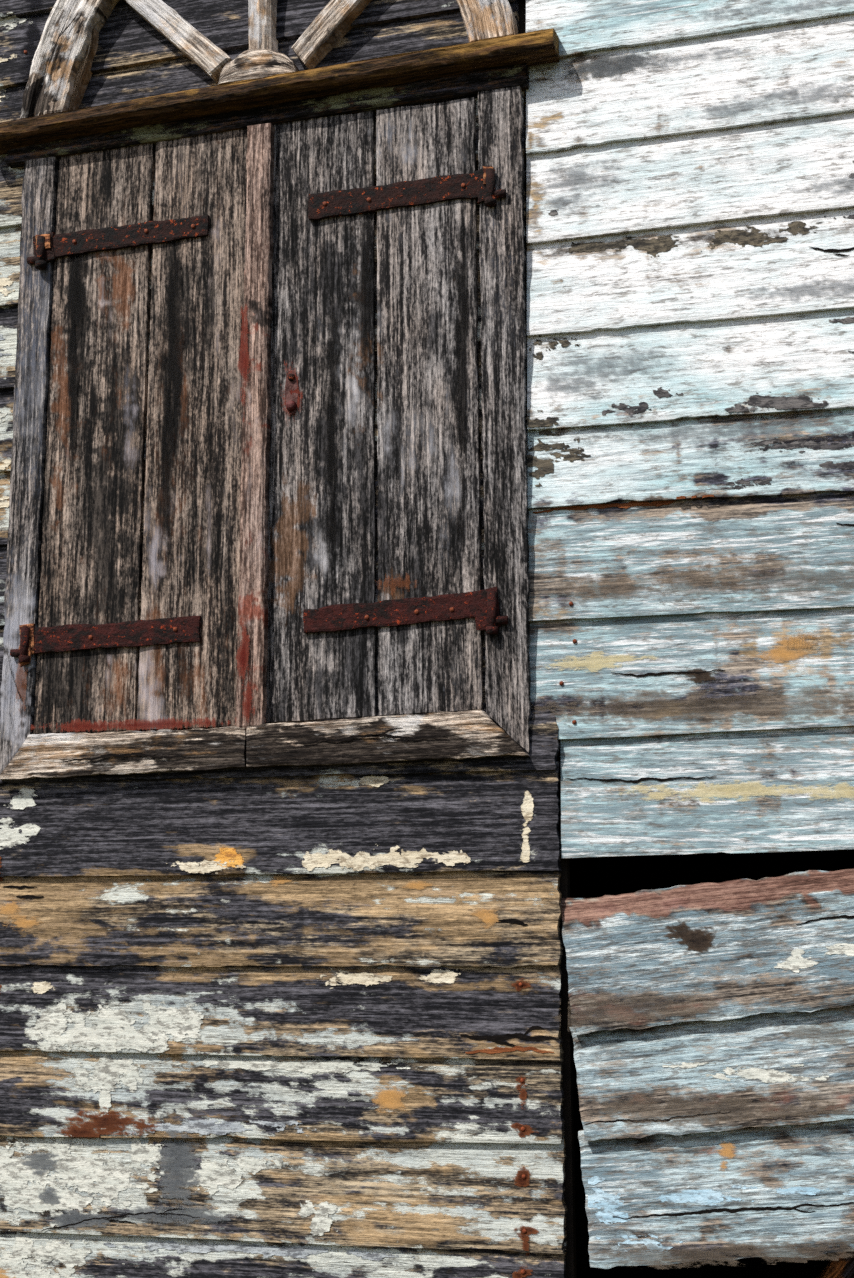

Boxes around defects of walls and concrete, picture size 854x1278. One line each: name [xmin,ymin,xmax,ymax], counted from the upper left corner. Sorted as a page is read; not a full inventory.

rust [36,234,51,250]
peeling [708,214,854,249]
rust [15,647,32,711]
rust [31,624,255,732]
peeling [172,847,246,874]
peeling [302,845,470,871]
peeling [318,968,393,989]
peeling [24,982,204,1129]
peeling [201,1056,449,1074]
rust [56,1107,158,1139]
peeling [0,1119,415,1278]
crack [613,1202,854,1220]